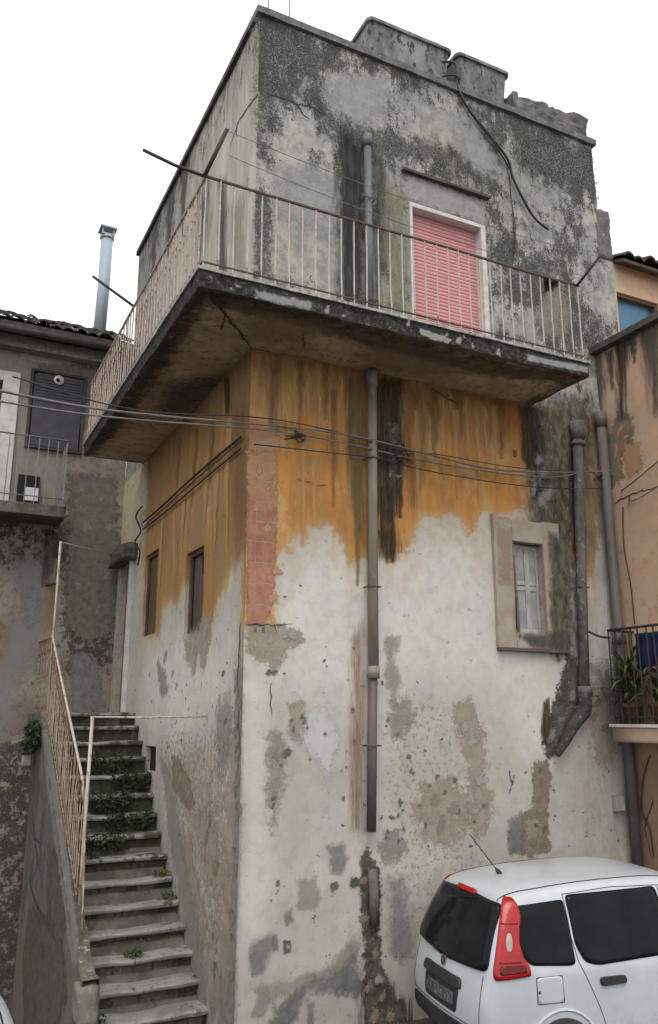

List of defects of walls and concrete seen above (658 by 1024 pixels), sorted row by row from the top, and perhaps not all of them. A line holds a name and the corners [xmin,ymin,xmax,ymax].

crack [231,93,340,142]
leakage [335,128,389,307]
crack [209,295,252,349]
spalling [244,426,305,675]
leakage [282,363,364,586]
leakage [86,288,583,563]
leakage [46,842,66,931]
peeling [265,700,308,826]
spalling [330,695,495,1024]
peeling [507,653,620,858]